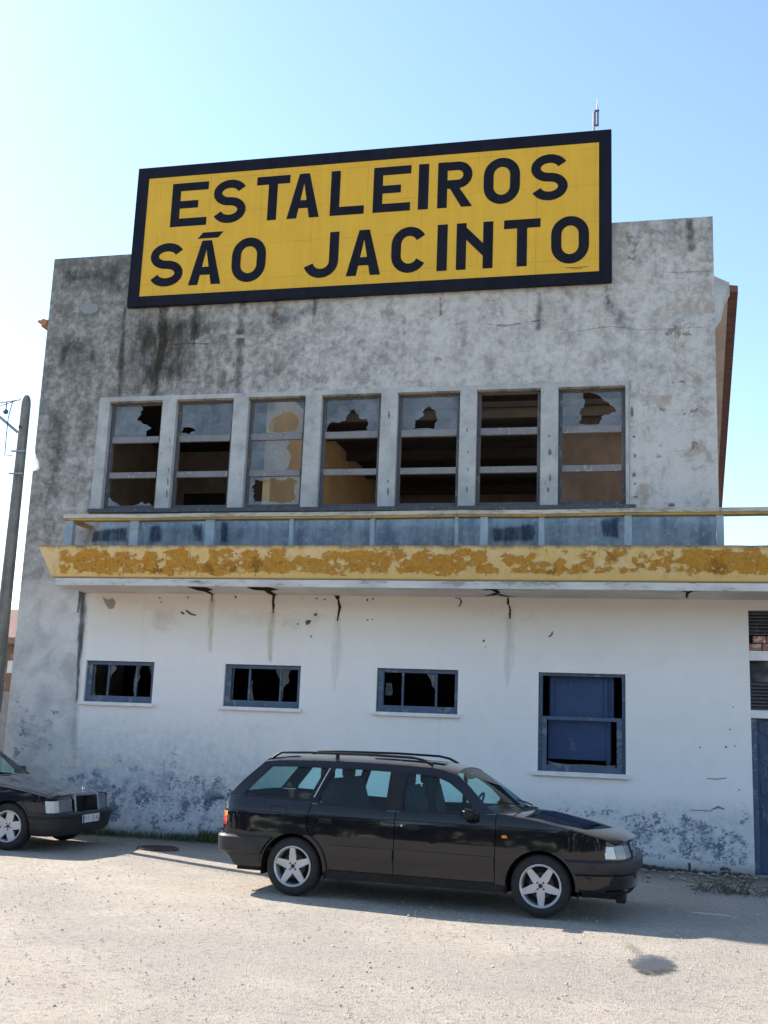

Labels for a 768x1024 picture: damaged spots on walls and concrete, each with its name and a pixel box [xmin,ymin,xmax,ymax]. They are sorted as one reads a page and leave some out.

water stain [140,307,200,395]
crack [189,587,214,602]
crack [247,556,278,613]
crack [333,595,341,621]
peeling [58,547,768,576]
crack [483,589,511,619]
water stain [76,591,85,701]
peeling [68,760,232,833]
peeling [558,806,749,867]